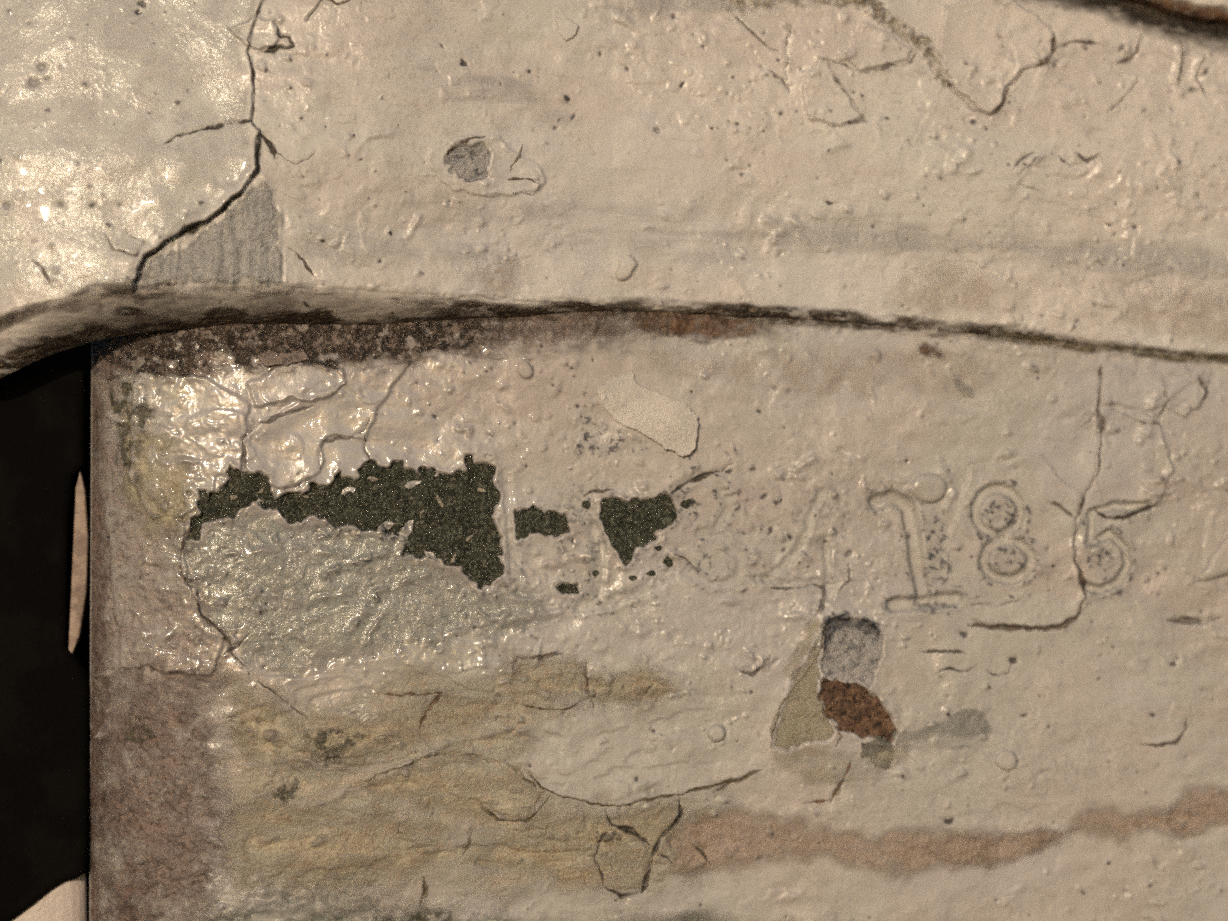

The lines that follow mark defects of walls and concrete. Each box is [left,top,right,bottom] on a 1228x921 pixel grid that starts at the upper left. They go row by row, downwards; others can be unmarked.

crack [106,0,349,284]
peeling [443,136,490,182]
crack [33,260,54,288]
peeling [141,181,283,286]
peeling [597,372,699,457]
water stain [0,307,604,921]
peeling [187,455,539,676]
peeling [514,505,570,540]
peeling [556,584,579,594]
peeling [581,494,695,581]
crack [436,300,1228,676]
peeling [770,612,903,781]